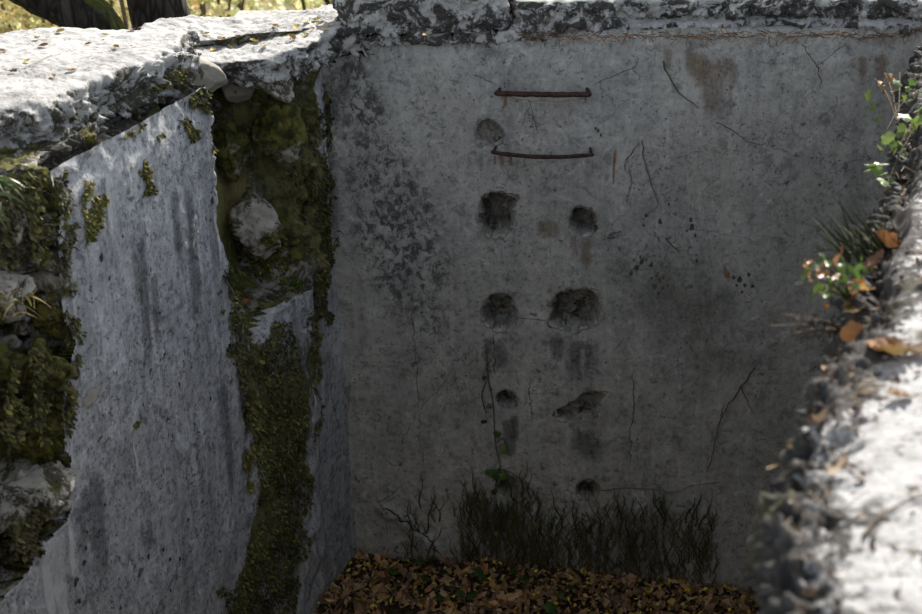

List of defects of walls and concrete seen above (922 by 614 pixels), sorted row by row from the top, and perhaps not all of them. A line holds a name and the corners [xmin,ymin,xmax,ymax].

spalling [474,117,506,148]
spalling [475,190,520,240]
spalling [564,206,600,240]
spalling [479,291,519,334]
spalling [546,286,606,334]
spalling [495,388,519,409]
spalling [552,390,609,425]